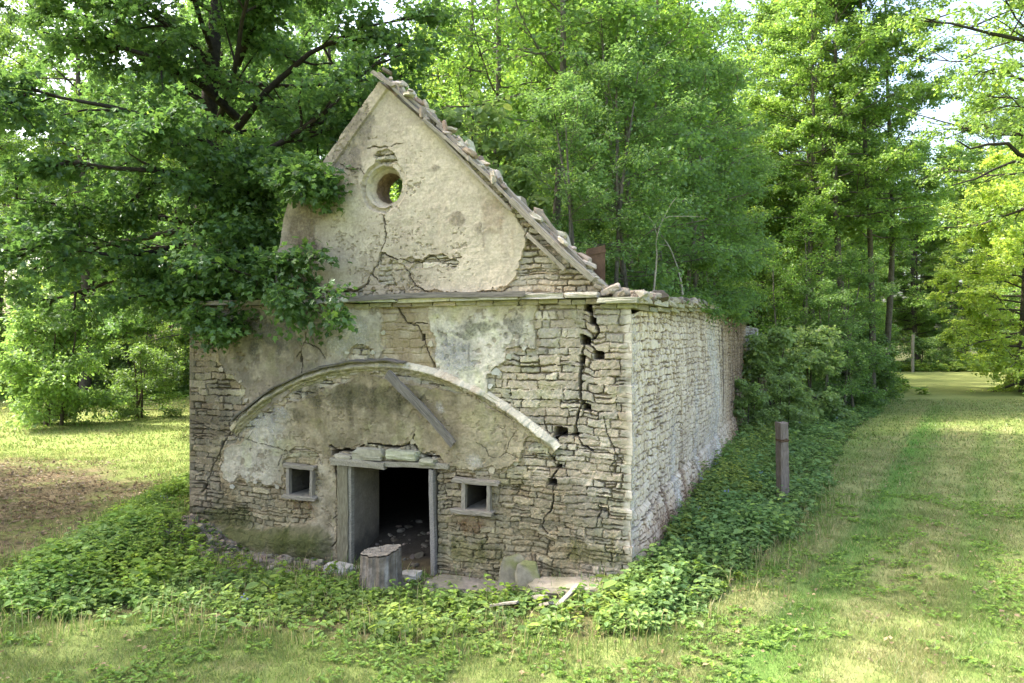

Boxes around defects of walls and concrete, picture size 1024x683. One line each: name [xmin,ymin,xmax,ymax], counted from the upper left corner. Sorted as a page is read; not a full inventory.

crack [340,142,402,175]
crack [309,214,512,369]
crack [190,419,441,554]
spalling [190,219,633,581]
crack [541,305,623,535]